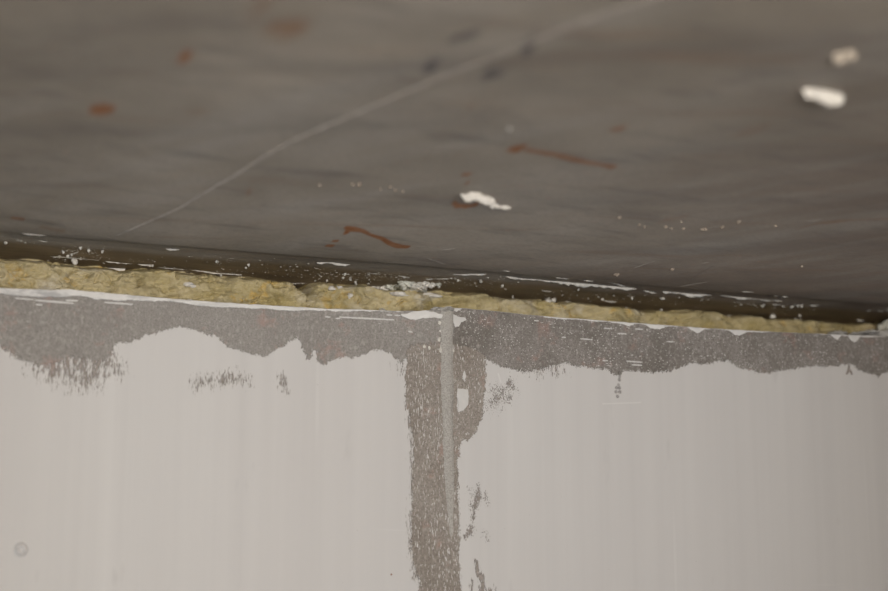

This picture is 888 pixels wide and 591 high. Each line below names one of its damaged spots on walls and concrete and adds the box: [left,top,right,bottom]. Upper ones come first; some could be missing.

corrosion [501,140,624,171]
corrosion [323,224,413,250]
water stain [15,297,78,306]